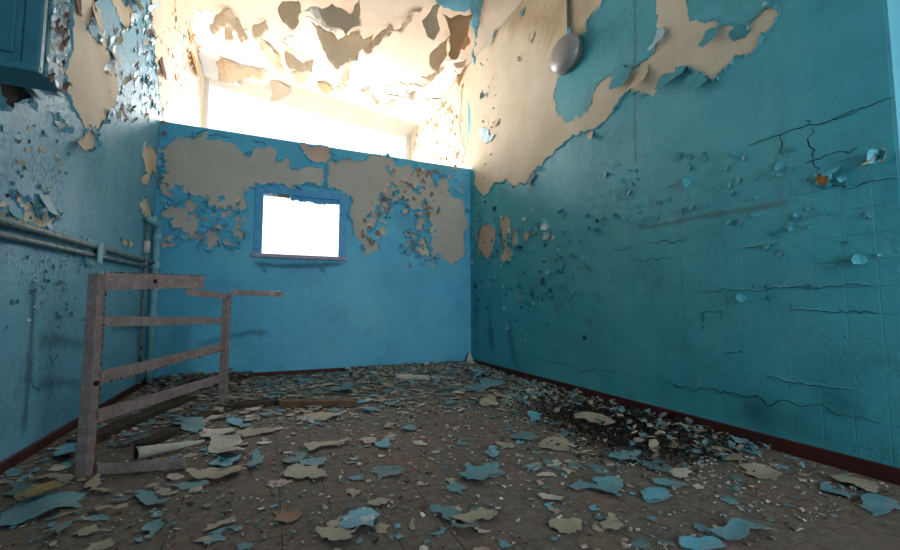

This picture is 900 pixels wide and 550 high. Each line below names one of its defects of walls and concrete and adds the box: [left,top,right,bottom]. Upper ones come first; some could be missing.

peeling [0,84,48,112]
peeling [0,125,70,260]
peeling [46,0,782,345]
crack [748,96,896,189]
peeling [802,166,848,189]
peeling [861,148,886,165]
peeling [851,253,884,264]
crack [699,282,877,330]
crack [528,355,878,423]